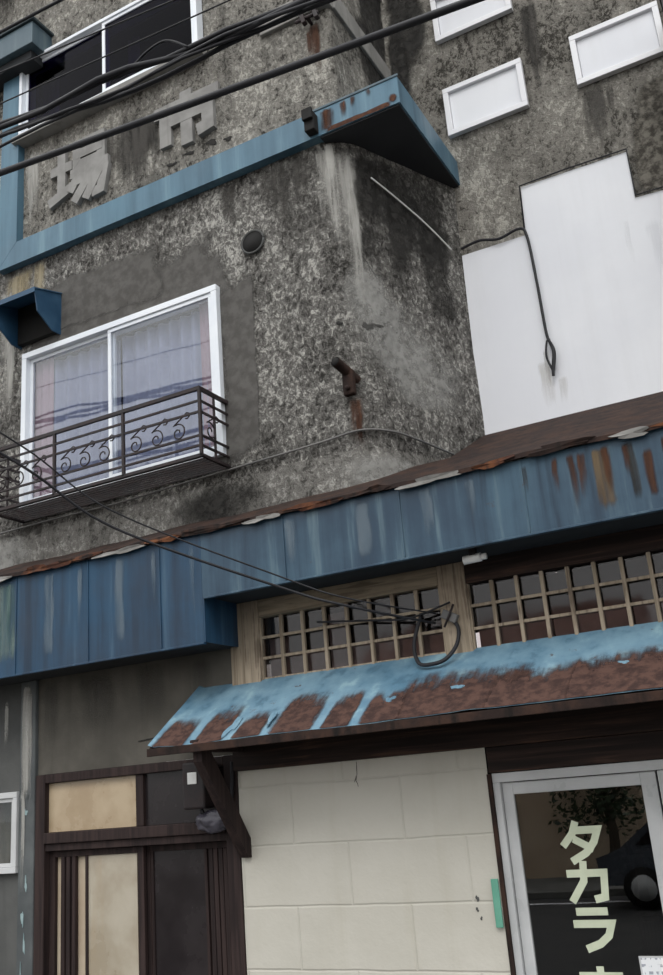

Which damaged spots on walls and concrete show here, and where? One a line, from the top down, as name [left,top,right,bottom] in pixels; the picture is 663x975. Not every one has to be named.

corrosion [322,94,396,132]
water stain [265,145,448,287]
corrosion [351,399,362,436]
corrosion [552,448,615,504]
corrosion [643,450,657,492]
corrosion [152,648,663,747]